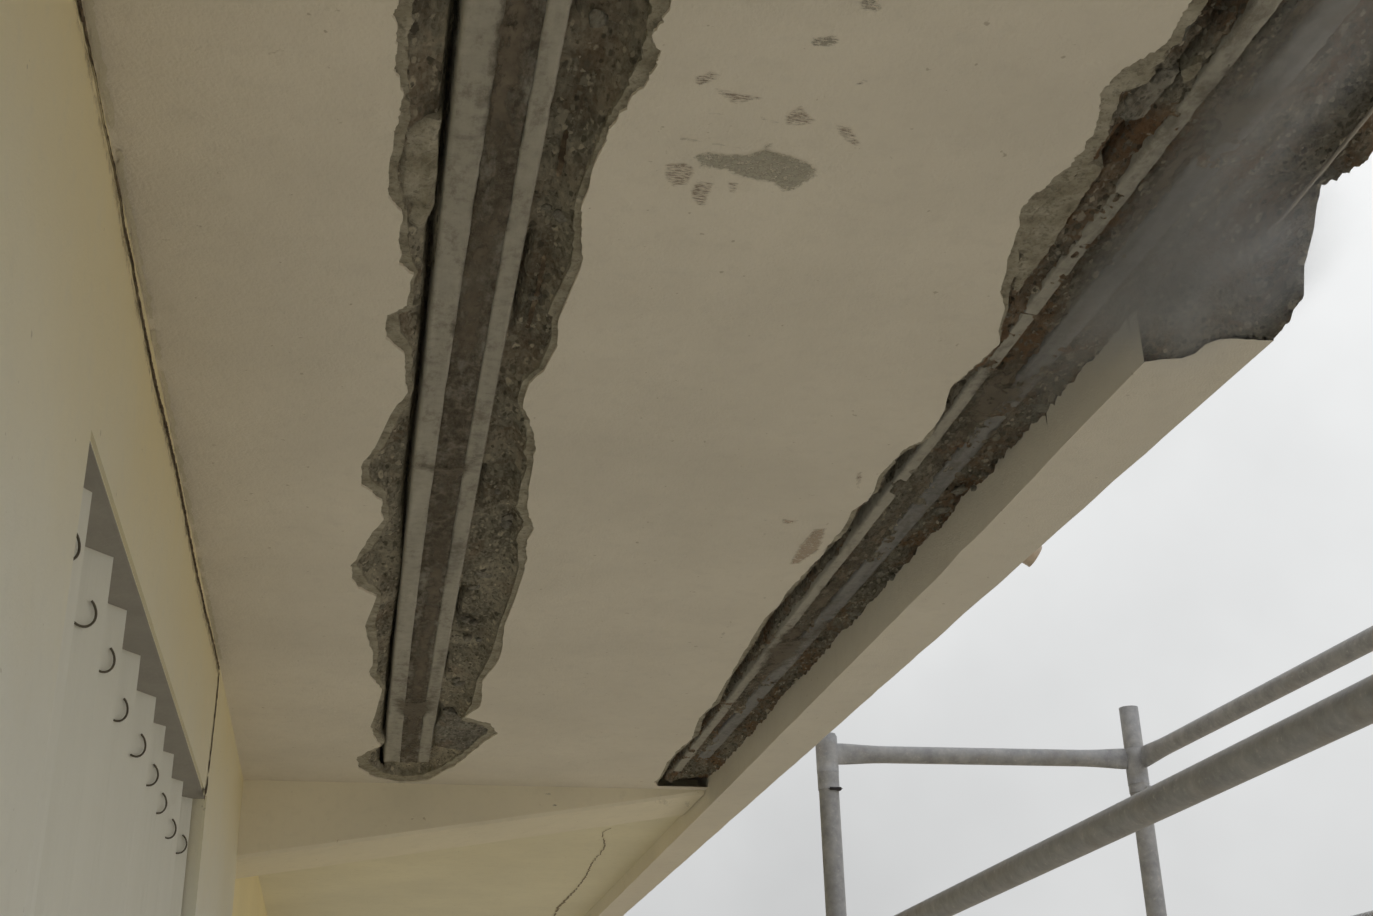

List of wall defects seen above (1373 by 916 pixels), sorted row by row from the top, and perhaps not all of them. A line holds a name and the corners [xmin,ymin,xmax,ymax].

spalling [350,0,671,781]
spalling [655,0,1373,783]
crack [554,828,611,916]